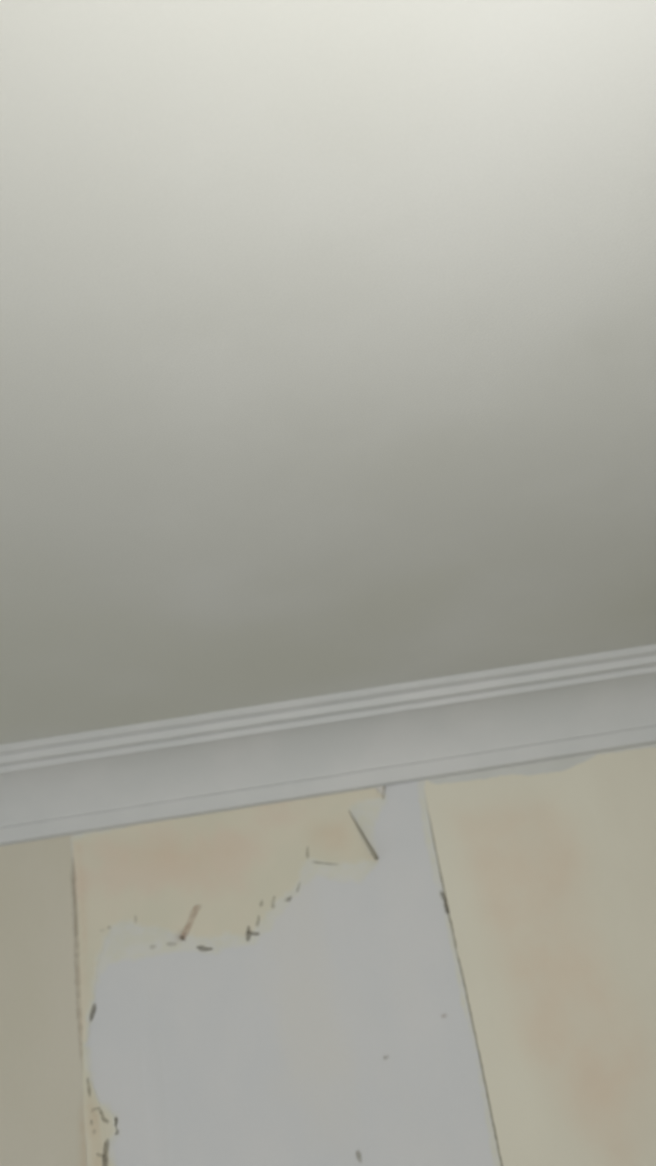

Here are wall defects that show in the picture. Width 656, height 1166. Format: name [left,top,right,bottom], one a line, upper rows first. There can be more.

peeling [84,782,492,1166]